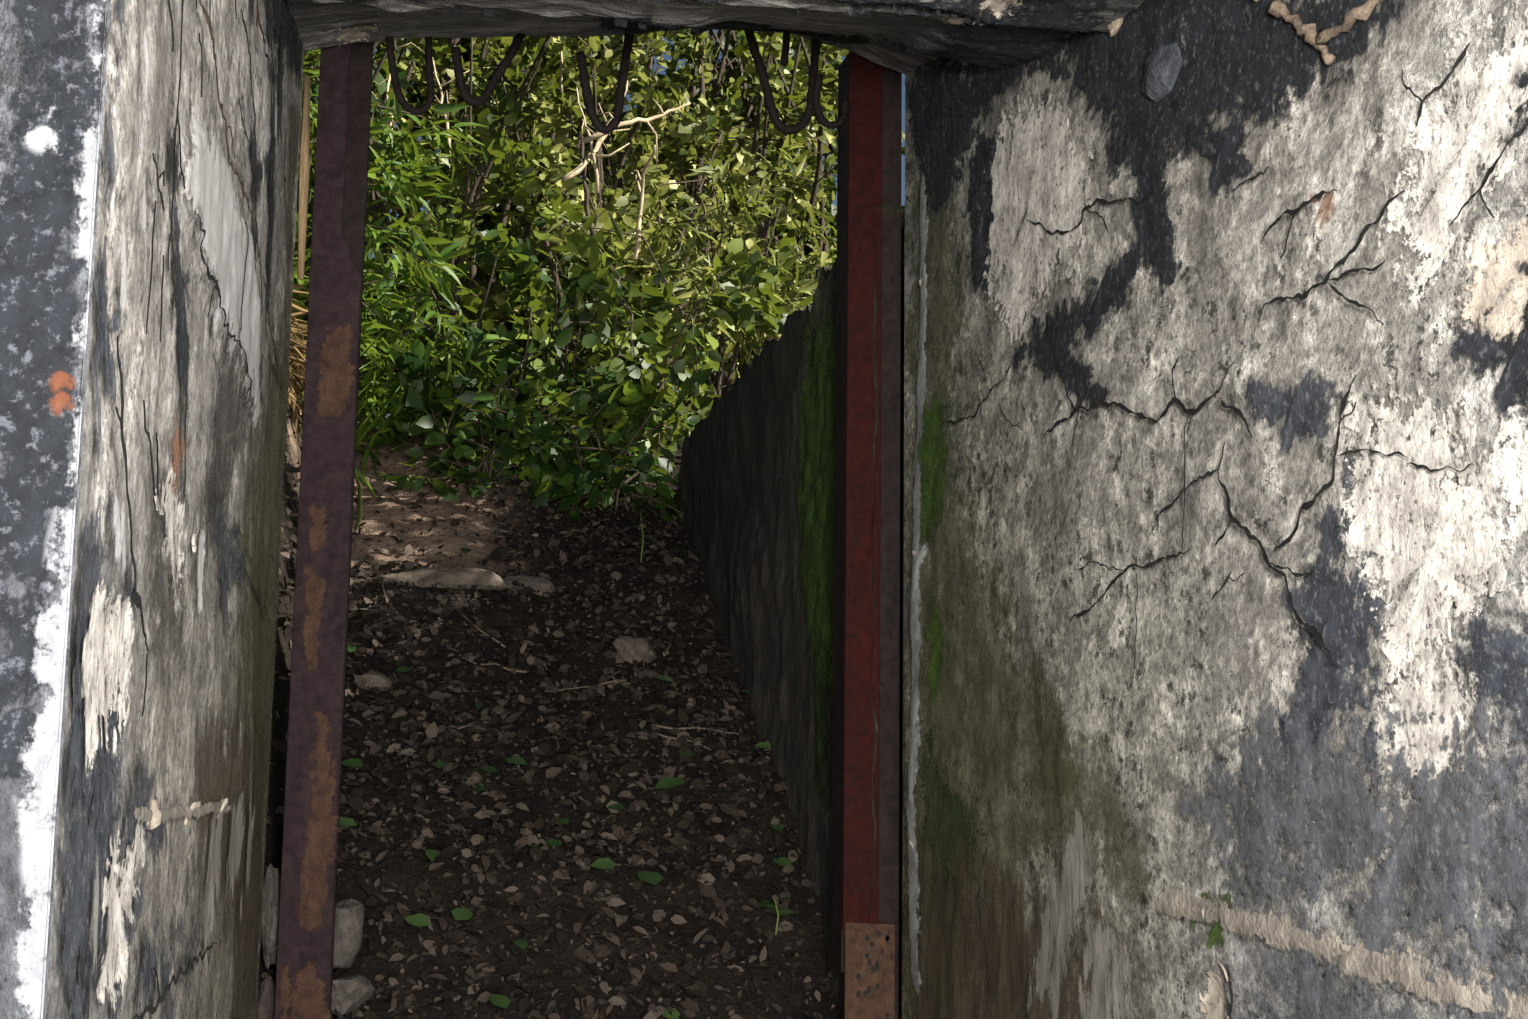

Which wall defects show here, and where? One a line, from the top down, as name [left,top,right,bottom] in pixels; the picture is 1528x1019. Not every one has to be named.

corrosion [51,371,75,412]
peeling [72,578,134,790]
damp [0,0,255,1019]
corrosion [303,505,328,671]
corrosion [299,711,339,932]
crack [1026,189,1153,235]
damp [1012,111,1191,419]
crack [942,356,1474,687]
damp [1179,454,1528,1019]
peeling [1339,366,1528,791]
peeling [1377,0,1528,343]
crack [132,942,218,1019]